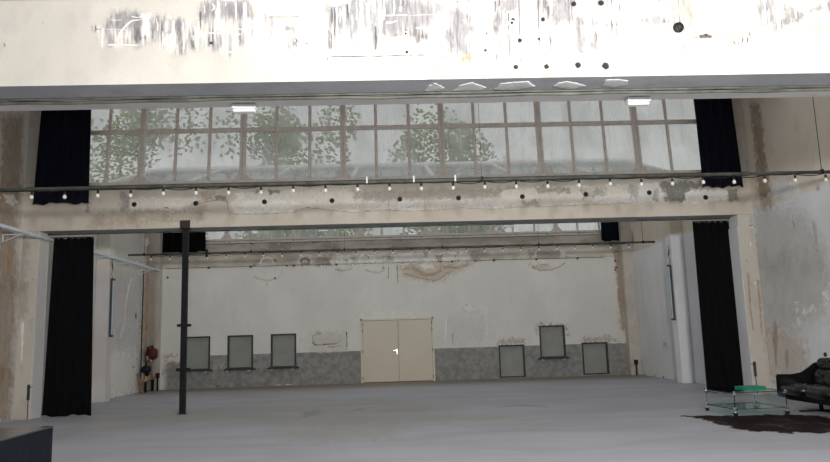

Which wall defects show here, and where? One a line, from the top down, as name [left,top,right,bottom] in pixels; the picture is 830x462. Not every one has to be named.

peeling [142,14,151,37]
flaking render [424,54,586,92]
damp [752,106,772,210]
flaking render [129,183,664,214]
damp [0,119,24,421]